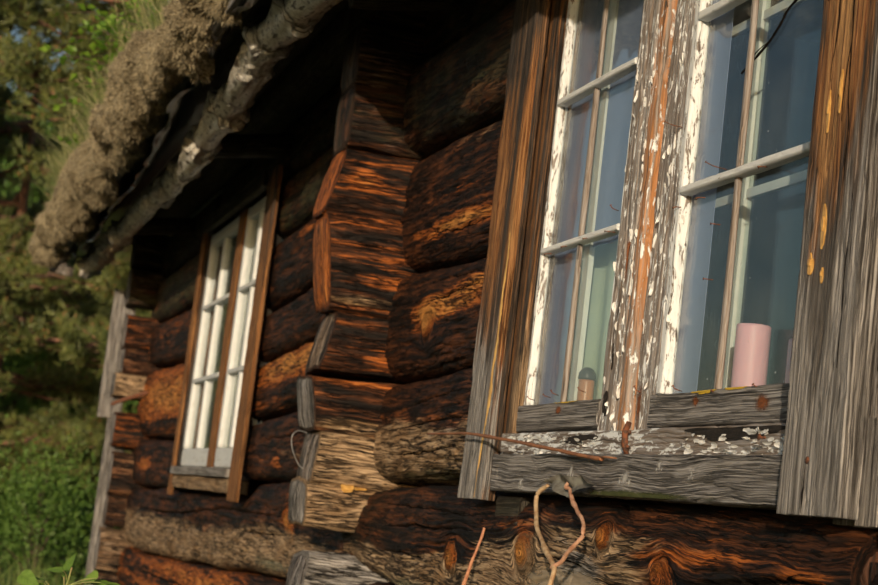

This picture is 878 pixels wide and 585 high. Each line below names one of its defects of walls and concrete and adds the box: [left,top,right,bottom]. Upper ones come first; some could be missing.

peeling [633,69,656,107]
peeling [653,134,676,254]
peeling [612,229,638,330]
peeling [605,377,622,431]
peeling [682,427,785,455]
crack [540,552,614,585]
crack [676,575,822,585]